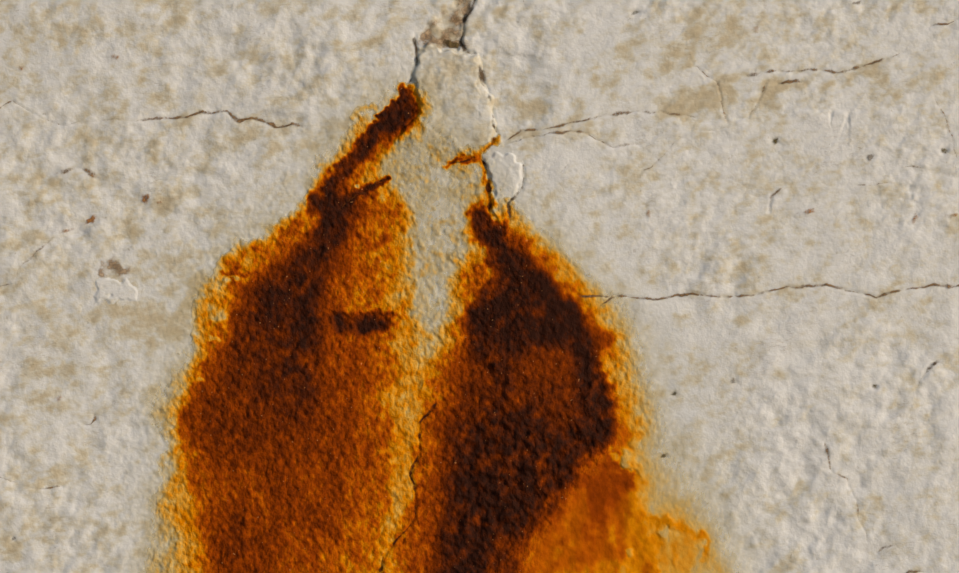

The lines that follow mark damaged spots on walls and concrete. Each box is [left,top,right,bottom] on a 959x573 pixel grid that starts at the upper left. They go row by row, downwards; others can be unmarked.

crack [143,110,300,128]
crack [460,0,490,97]
crack [751,59,882,92]
crack [340,179,386,210]
crack [451,118,626,218]
rust [147,82,733,573]
crack [582,283,959,303]
crack [379,403,436,572]